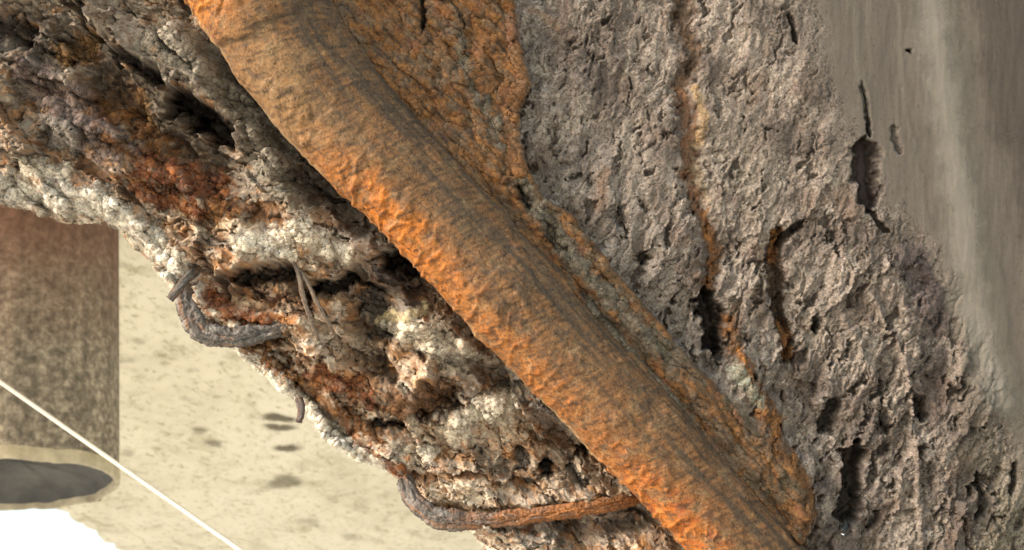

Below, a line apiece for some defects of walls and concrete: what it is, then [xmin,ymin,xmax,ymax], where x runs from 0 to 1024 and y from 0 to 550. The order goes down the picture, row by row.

corrosion [11,27,305,235]
crack [850,82,901,232]
corrosion [205,287,273,326]
spalling [0,0,685,550]
corrosion [238,330,460,480]
corrosion [333,0,817,546]
spalling [514,0,1024,550]
crack [764,220,803,361]